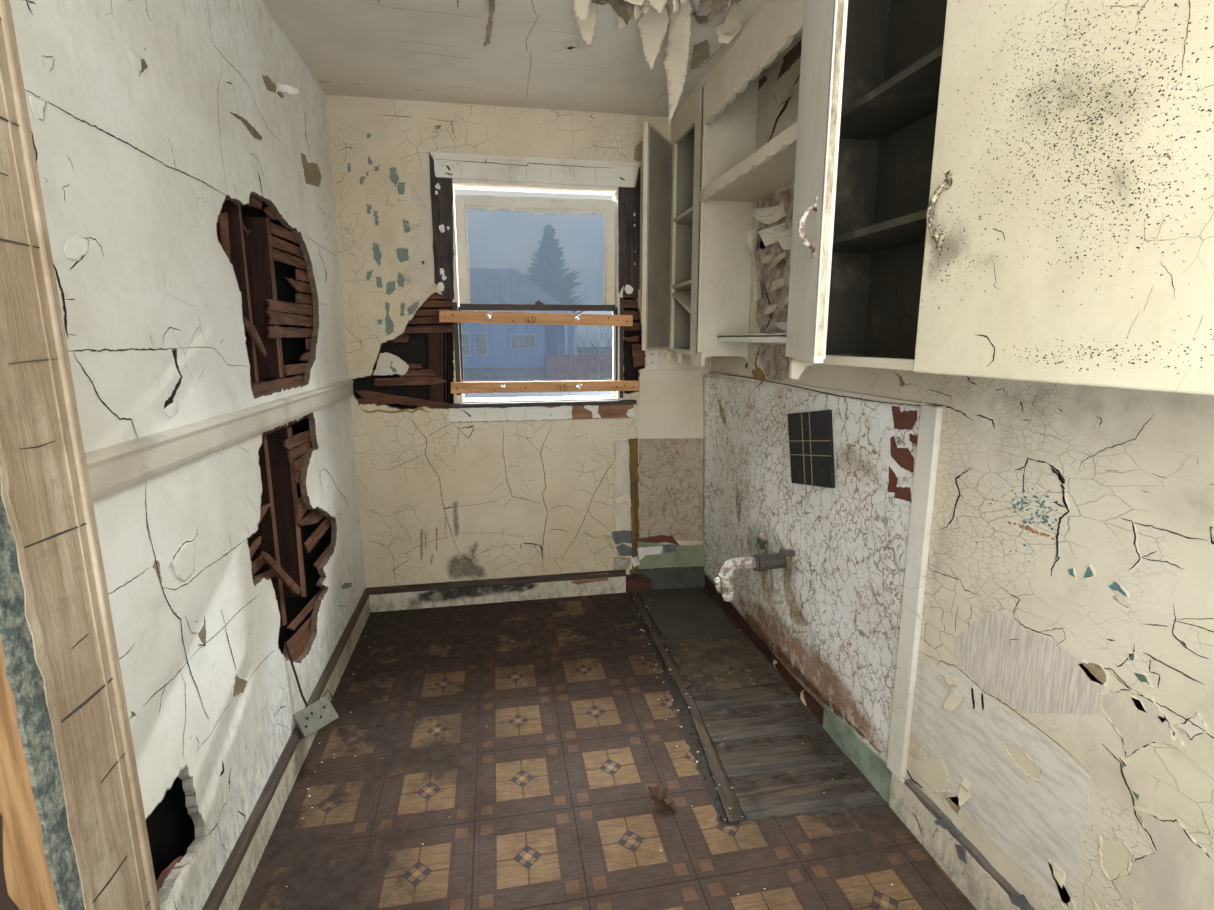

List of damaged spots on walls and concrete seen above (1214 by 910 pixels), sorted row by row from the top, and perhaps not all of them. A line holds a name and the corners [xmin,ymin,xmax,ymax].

peeling [559,0,746,127]
mould [922,0,1214,315]
crack [0,237,248,438]
hole [216,192,319,399]
flaking render [345,155,455,410]
crack [711,224,1154,576]
mould [1003,315,1214,374]
flaking render [247,412,352,663]
water stain [419,544,535,601]
peeling [908,611,1214,910]
crack [1095,605,1214,739]
crack [1121,516,1207,572]